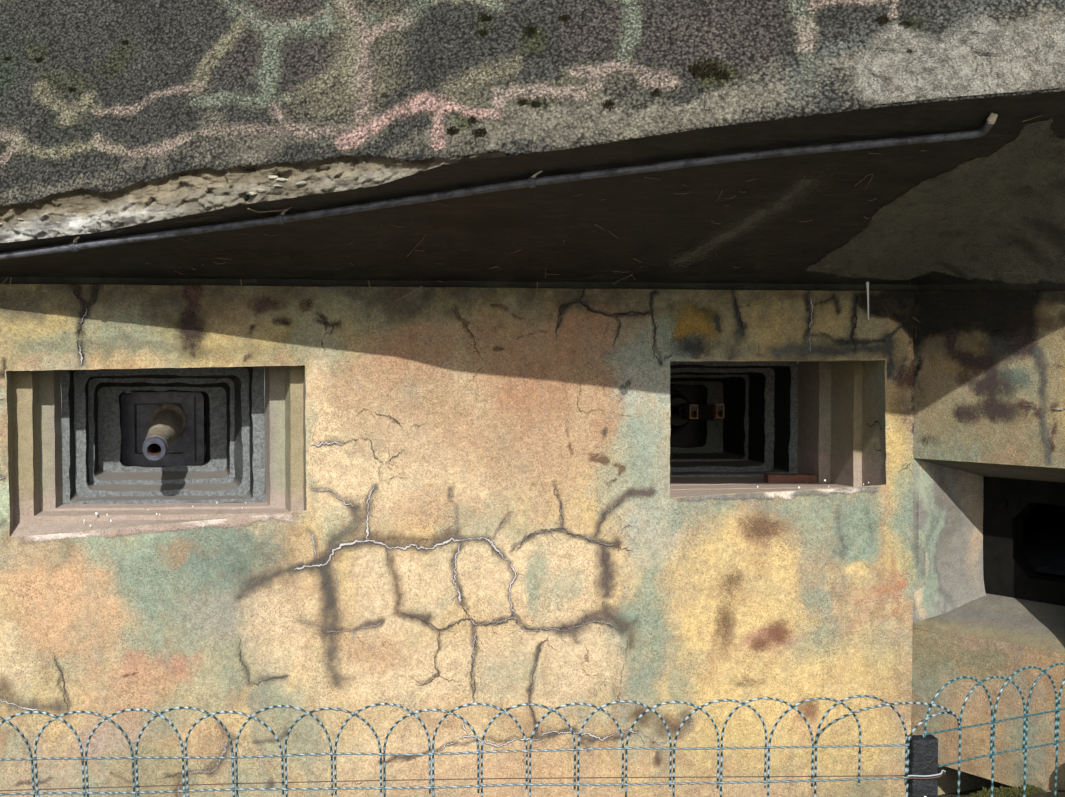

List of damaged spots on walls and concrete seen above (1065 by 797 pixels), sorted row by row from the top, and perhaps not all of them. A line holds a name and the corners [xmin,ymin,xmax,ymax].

spalling [0,0,682,243]
peeling [806,119,1065,284]
crack [70,284,99,364]
crack [549,288,664,365]
damp [772,290,1065,464]
crack [0,655,68,723]
crack [238,639,290,686]
crack [288,408,655,769]